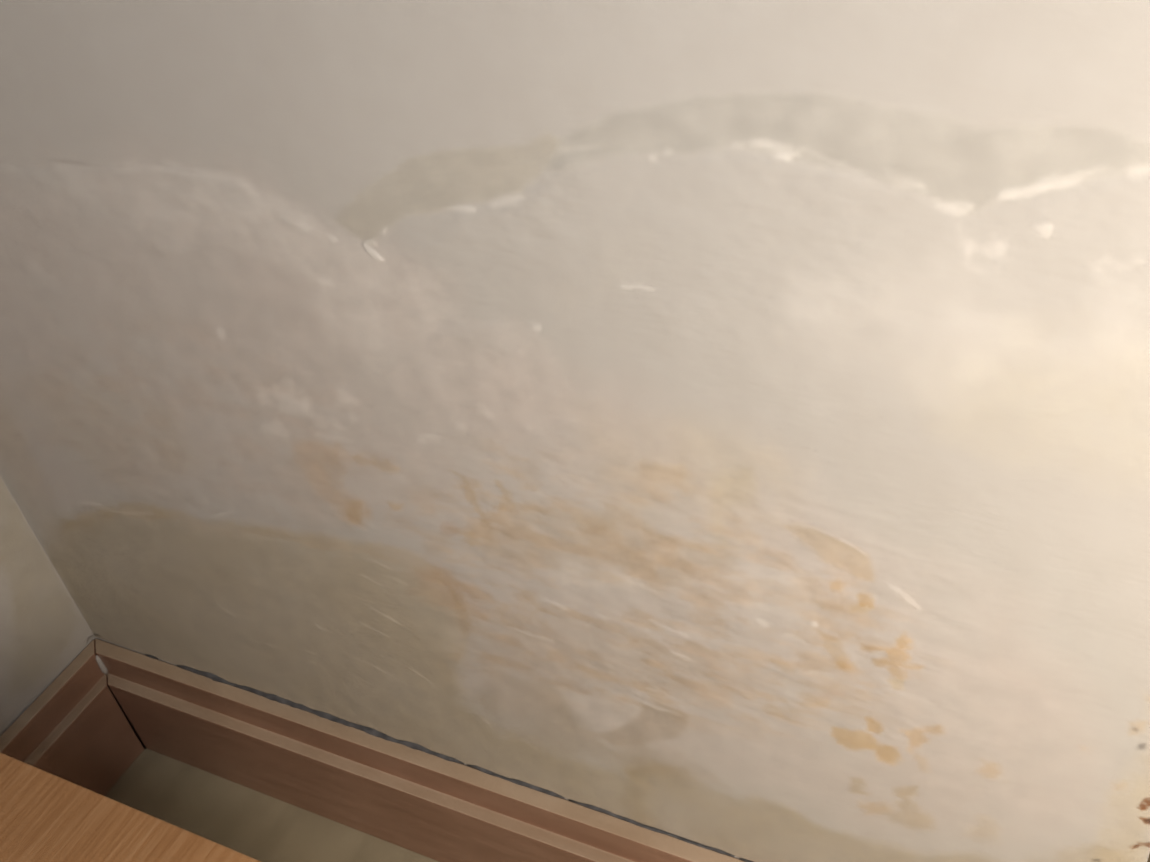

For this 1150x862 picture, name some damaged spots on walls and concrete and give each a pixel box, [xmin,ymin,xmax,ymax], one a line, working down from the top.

water stain [177,665,753,862]